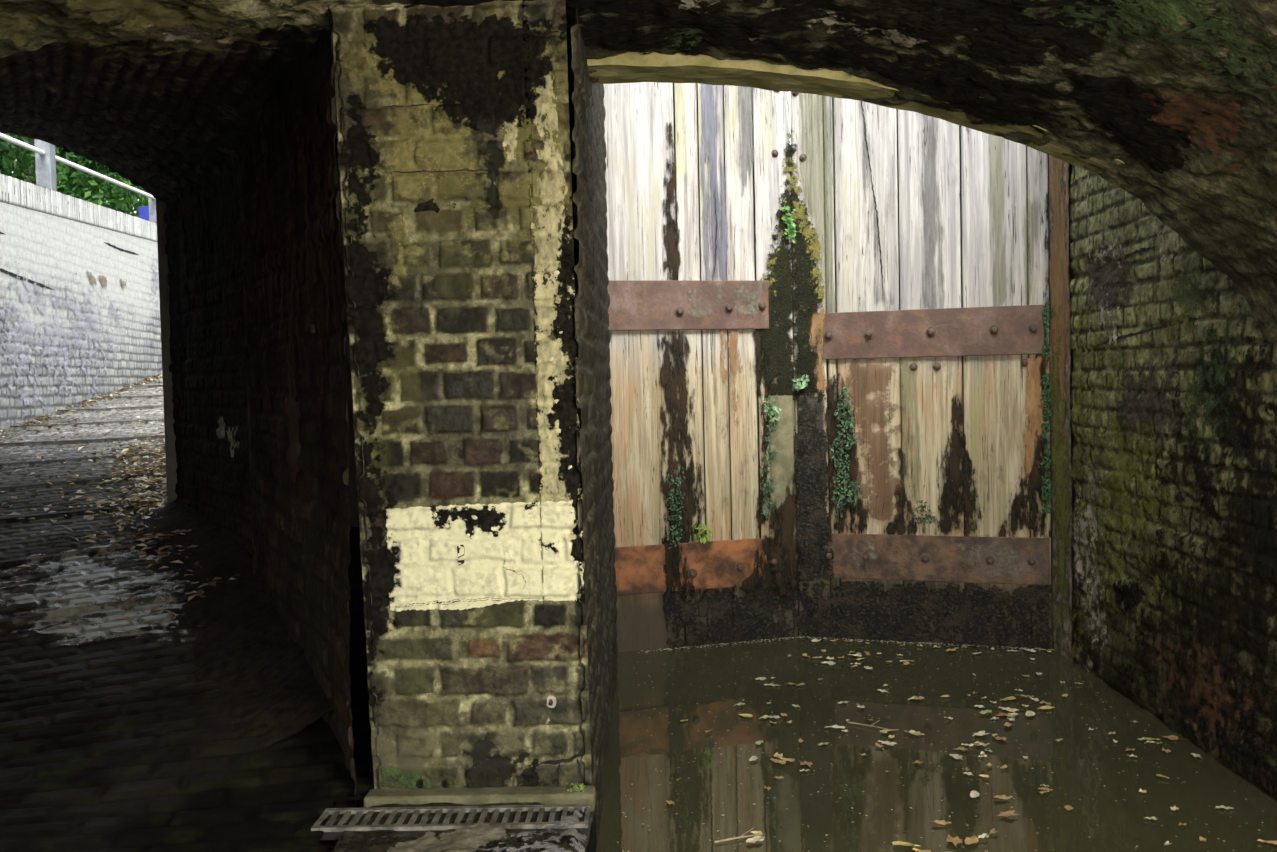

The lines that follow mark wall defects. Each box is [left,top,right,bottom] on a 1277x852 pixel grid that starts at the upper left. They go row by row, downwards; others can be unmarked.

water stain [195,0,534,49]
water stain [519,79,537,123]
water stain [477,115,505,219]
water stain [565,0,1196,308]
water stain [388,214,407,277]
peeling [386,73,586,612]
water stain [657,84,1052,649]
water stain [1098,243,1122,345]
water stain [1071,273,1277,801]